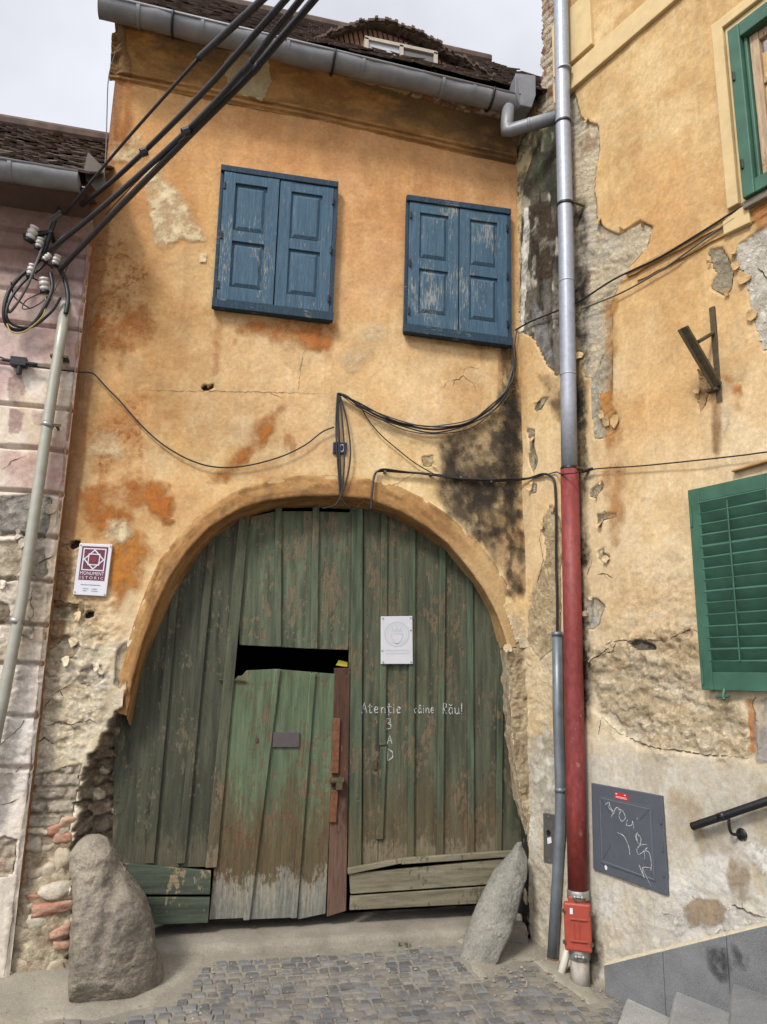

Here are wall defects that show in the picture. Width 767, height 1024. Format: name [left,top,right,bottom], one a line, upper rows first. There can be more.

flaking render [224,50,272,102]
peeling [142,164,204,245]
flaking render [516,125,560,376]
flaking render [570,91,653,438]
flaking render [706,225,767,350]
damp [439,348,526,596]
flaking render [527,428,537,493]
damp [80,480,174,596]
flaking render [503,504,562,833]
crack [588,629,698,667]
crack [598,697,759,759]
flaking render [0,765,112,973]